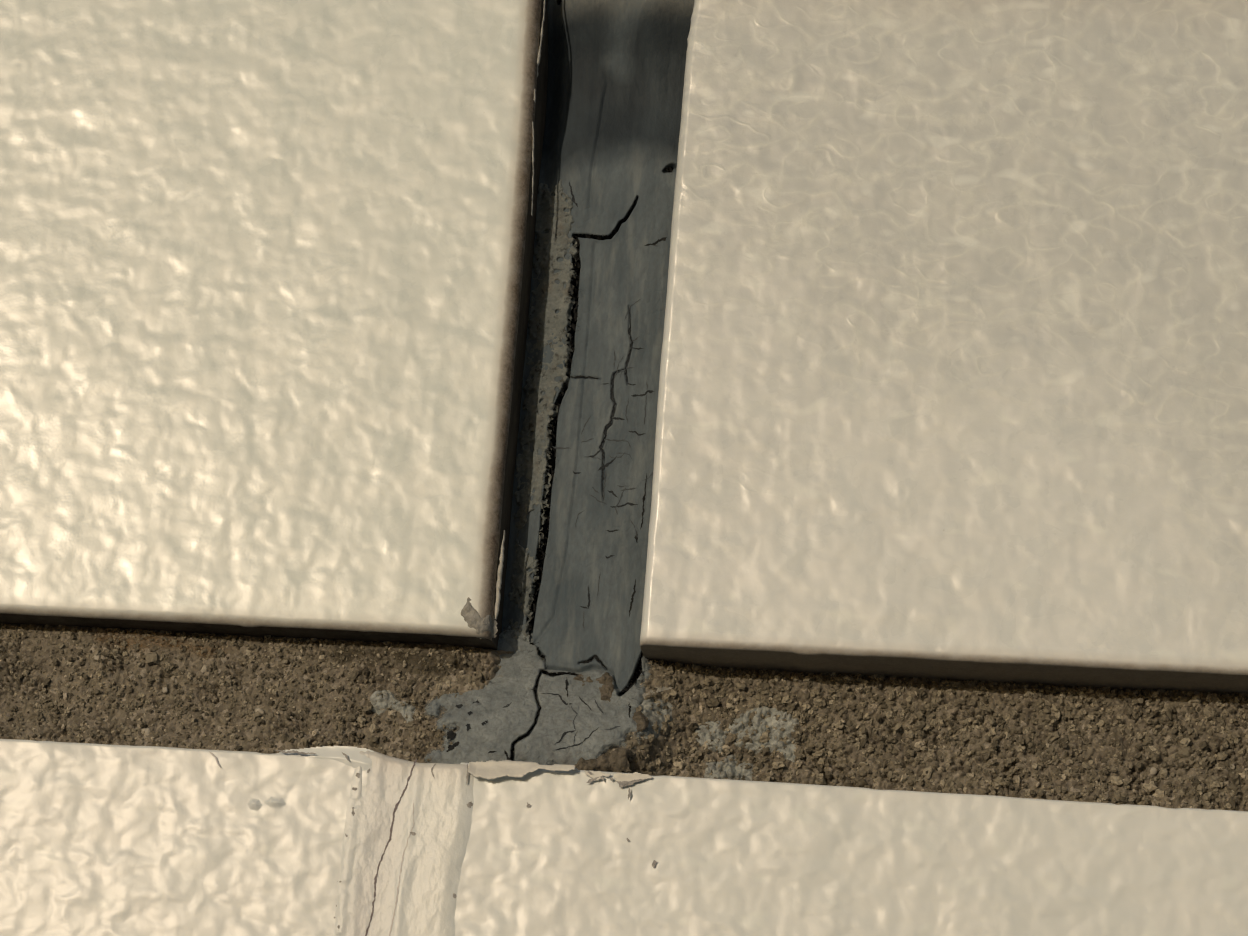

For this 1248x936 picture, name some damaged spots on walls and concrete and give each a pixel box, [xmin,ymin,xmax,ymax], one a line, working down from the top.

crack [488,182,667,761]
peeling [276,746,377,790]
crack [365,759,417,936]
peeling [466,760,652,800]